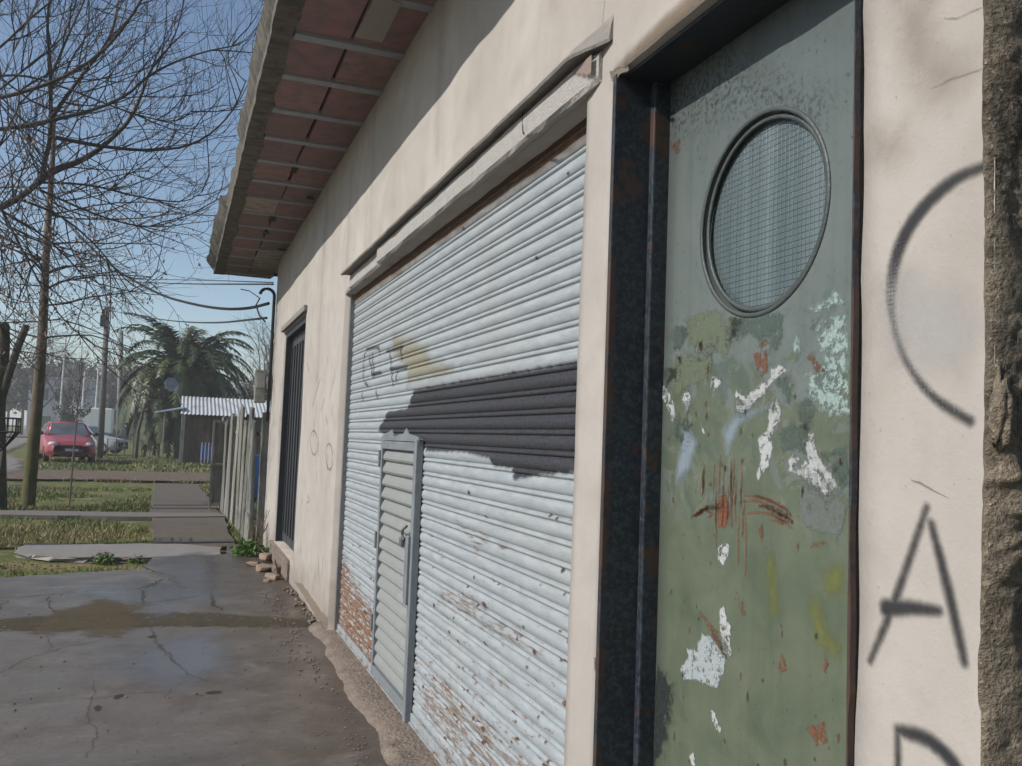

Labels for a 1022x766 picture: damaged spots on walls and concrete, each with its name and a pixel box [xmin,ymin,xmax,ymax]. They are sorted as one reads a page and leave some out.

peeling [663,309,783,442]
peeling [735,292,850,539]
crack [0,566,186,614]
damp [27,555,228,637]
rust [339,561,374,662]
peeling [680,606,732,688]
peeling [718,543,729,565]
rust [693,461,793,574]